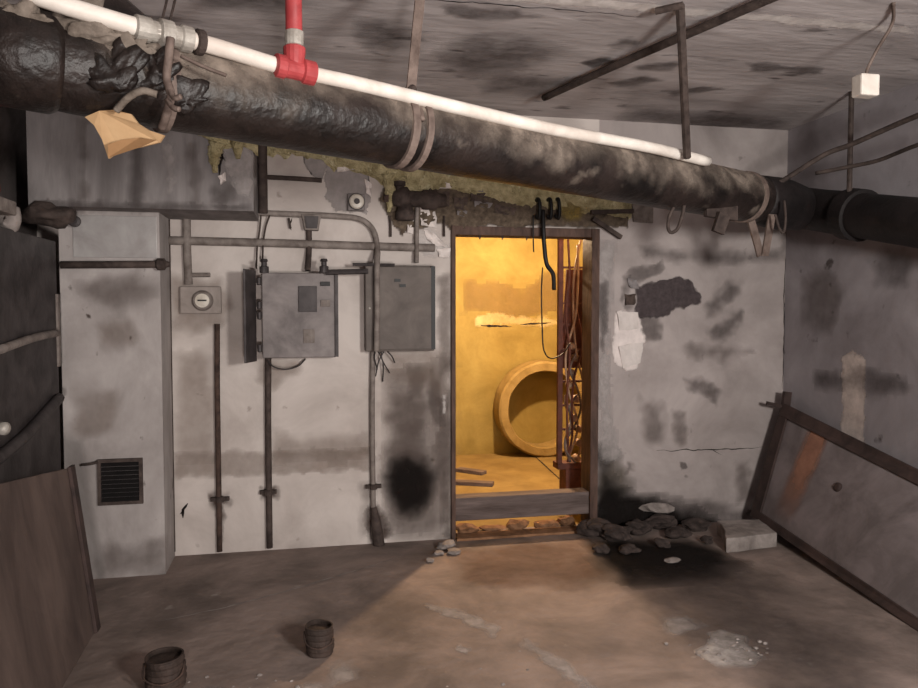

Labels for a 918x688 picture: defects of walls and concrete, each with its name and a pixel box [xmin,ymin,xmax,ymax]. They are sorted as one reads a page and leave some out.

spalling [325,166,629,258]
spalling [599,243,701,461]
damp [597,461,715,526]